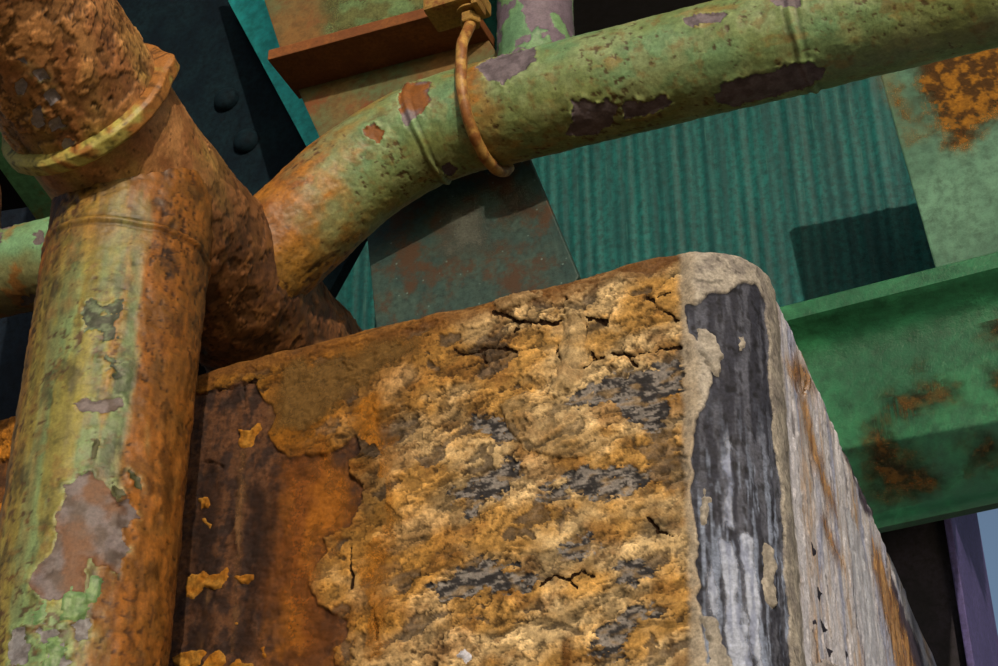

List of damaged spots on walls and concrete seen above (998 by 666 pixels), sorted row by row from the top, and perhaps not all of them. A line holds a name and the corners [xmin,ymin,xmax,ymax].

peeling [714,61,826,107]
corrosion [914,48,998,149]
crack [454,292,683,369]
corrosion [865,429,938,500]
peeling [8,470,142,666]
leakage [708,441,763,666]
peeling [456,649,472,664]